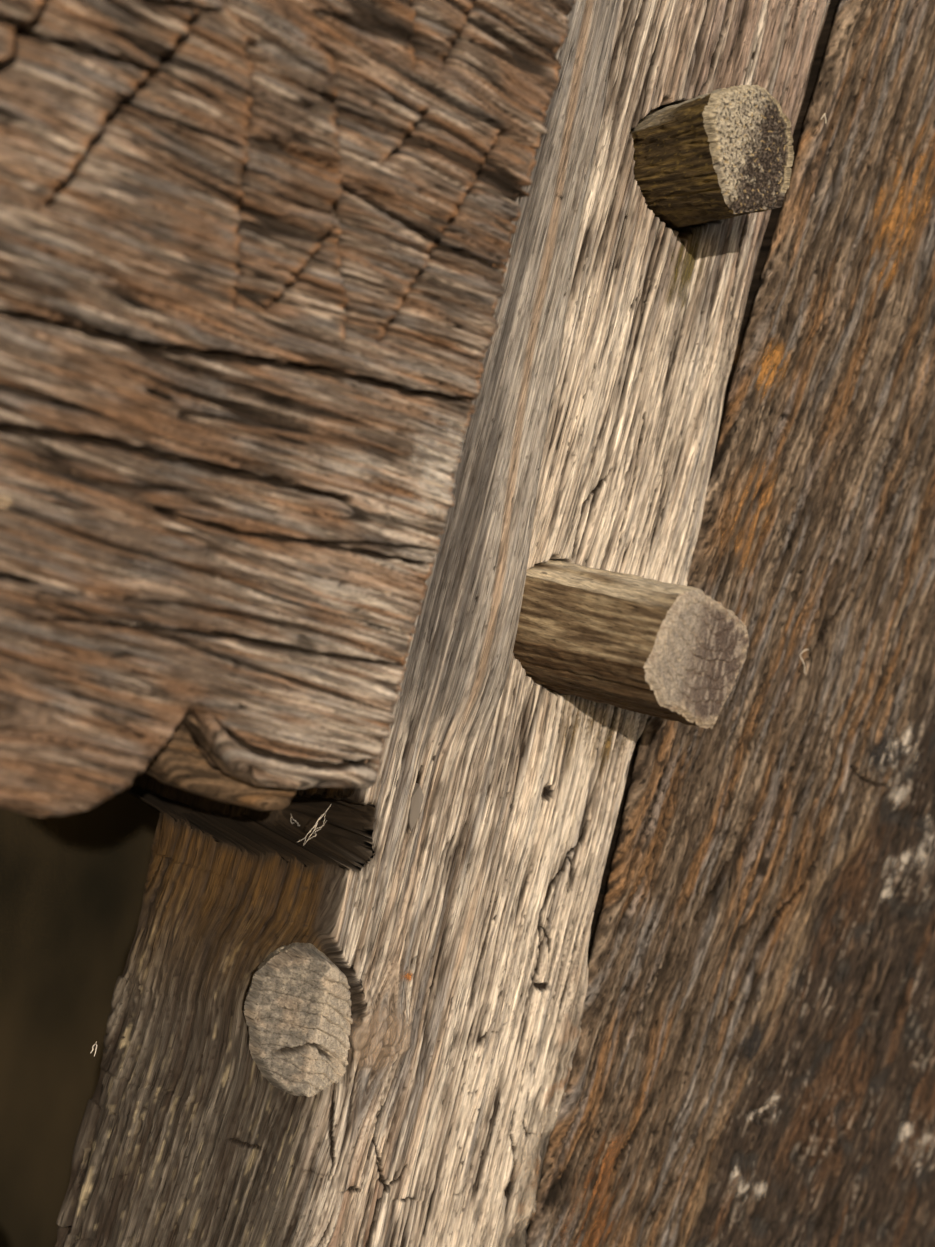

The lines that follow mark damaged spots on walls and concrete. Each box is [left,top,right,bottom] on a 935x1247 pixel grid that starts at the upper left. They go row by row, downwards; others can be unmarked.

crack [142,0,221,13]
crack [0,16,244,148]
crack [340,184,502,270]
crack [0,309,467,403]
crack [0,423,350,502]
crack [572,414,645,560]
crack [154,507,434,565]
crack [0,573,36,584]
crack [38,616,399,666]
crack [216,719,375,769]